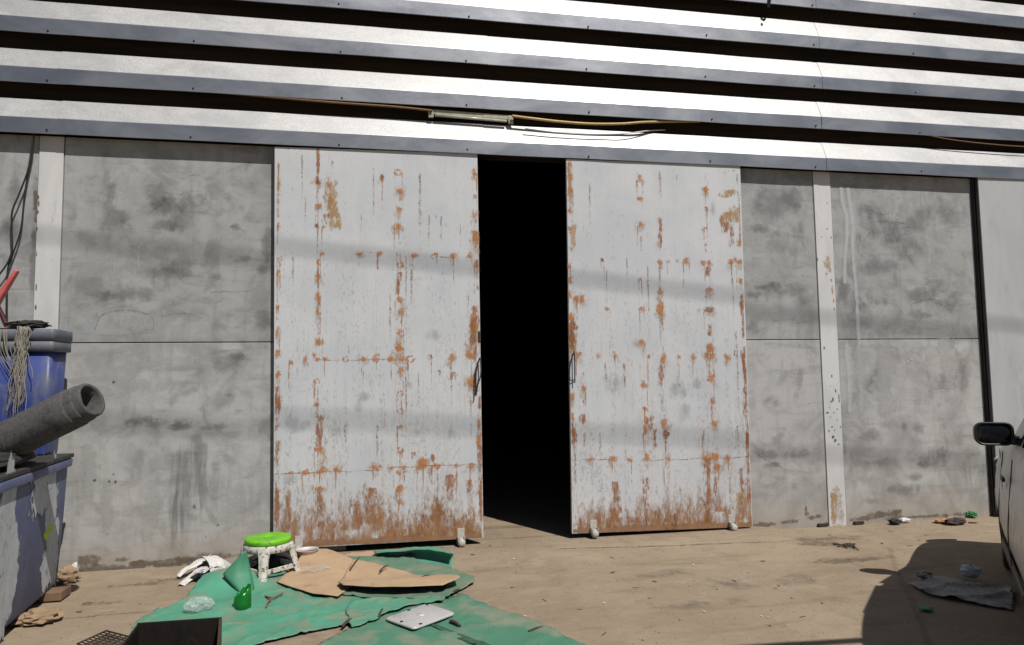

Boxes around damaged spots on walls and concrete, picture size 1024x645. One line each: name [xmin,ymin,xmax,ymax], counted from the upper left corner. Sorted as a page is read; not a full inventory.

corrosion [302,148,342,323]
corrosion [567,162,576,250]
corrosion [702,170,743,283]
damp [840,187,859,330]
corrosion [274,252,483,547]
corrosion [567,260,752,533]